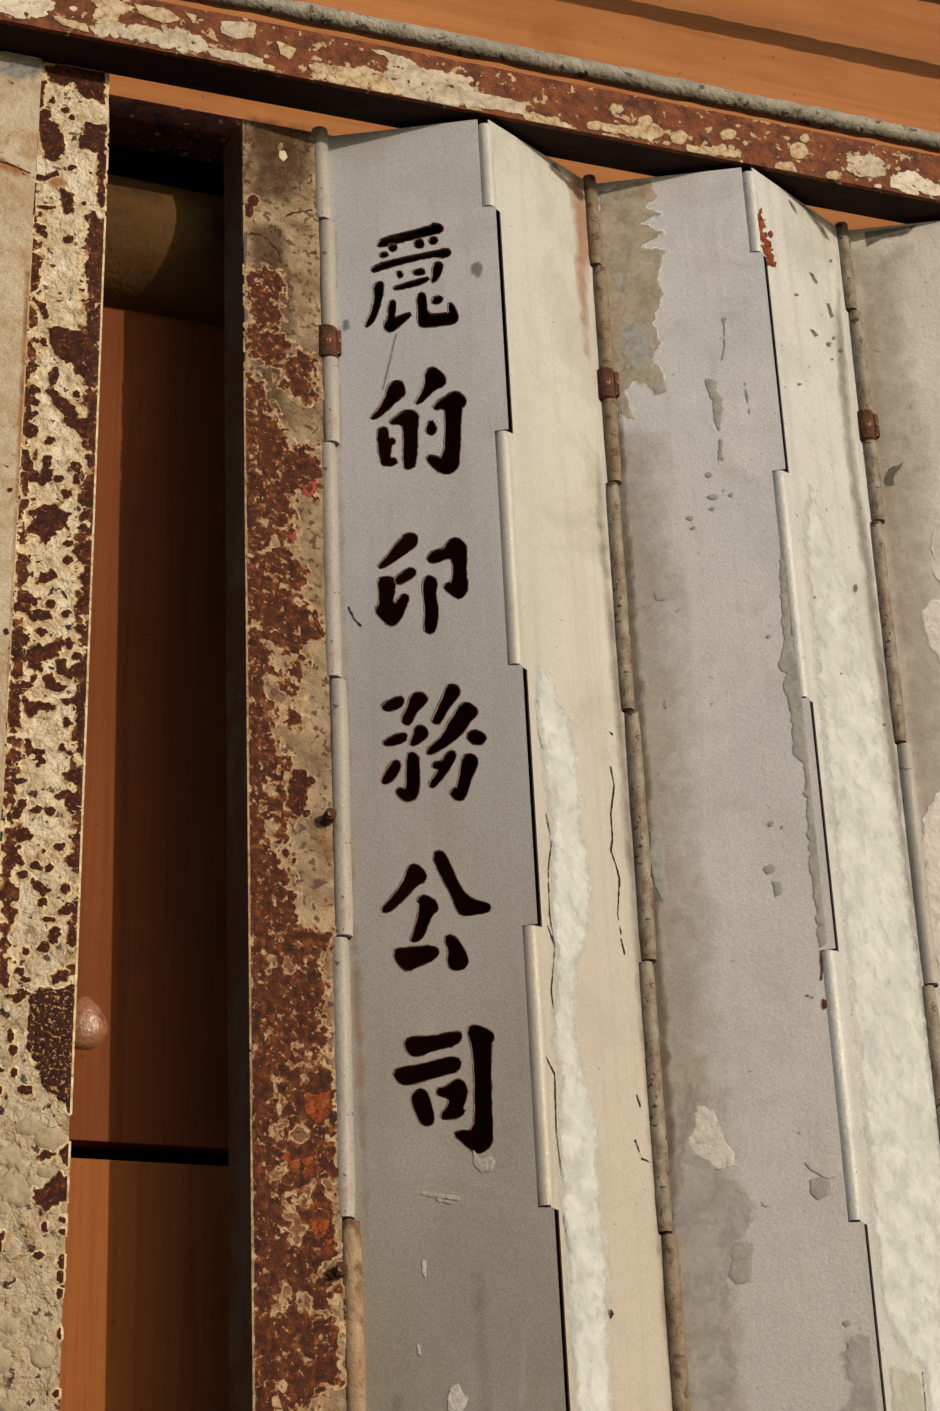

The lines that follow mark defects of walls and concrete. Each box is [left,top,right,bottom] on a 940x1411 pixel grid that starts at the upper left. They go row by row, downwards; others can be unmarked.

peeling [0,0,296,71]
peeling [308,49,742,158]
peeling [774,133,809,172]
peeling [825,153,940,196]
rust [758,208,777,267]
rust [0,63,110,1116]
rust [243,120,347,1411]
rust [0,1228,8,1256]
rust [30,1141,71,1302]
rust [54,1322,64,1342]
rust [49,1387,62,1401]